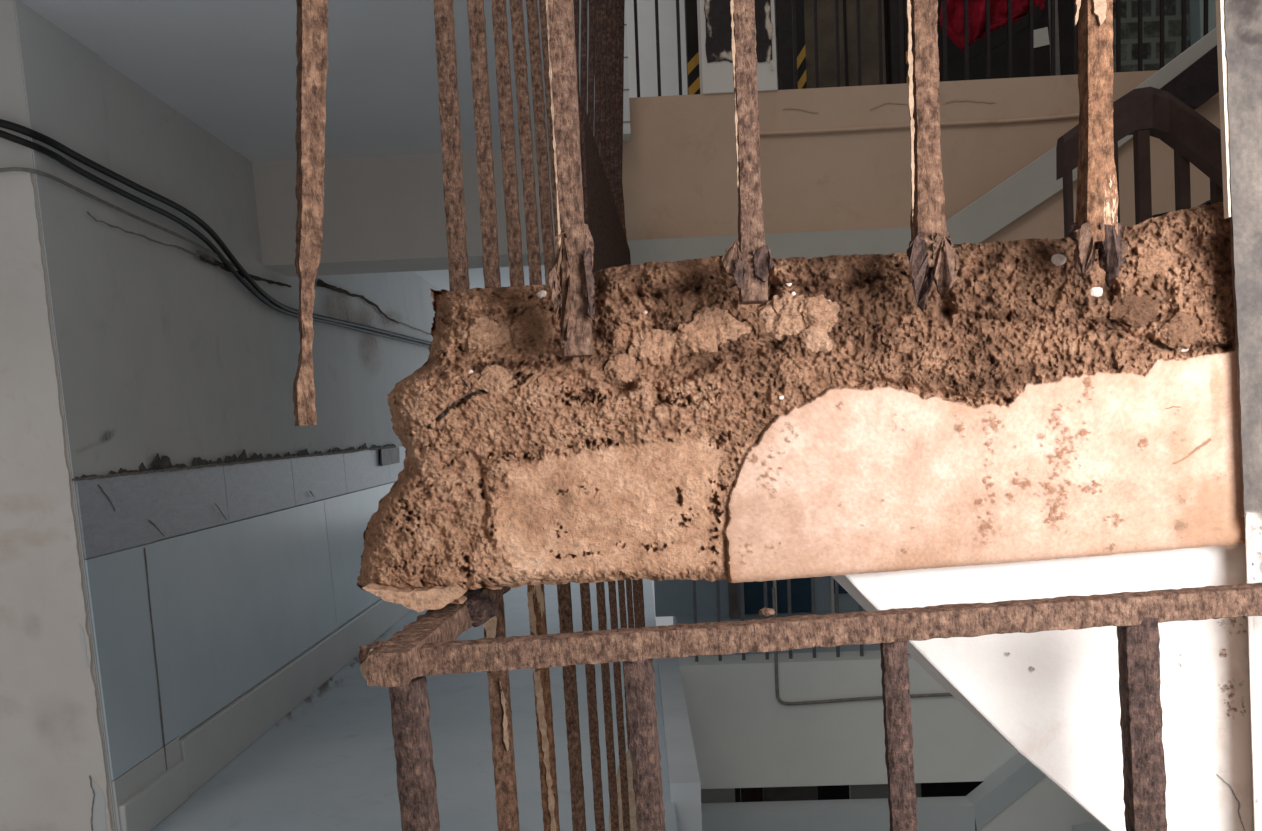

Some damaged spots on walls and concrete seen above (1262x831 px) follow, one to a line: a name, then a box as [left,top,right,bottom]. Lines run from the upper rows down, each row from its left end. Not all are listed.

crack [87,212,431,335]
corrosion [549,231,596,348]
corrosion [721,240,772,289]
corrosion [909,232,959,313]
corrosion [1073,221,1129,287]
spalling [72,202,1236,612]